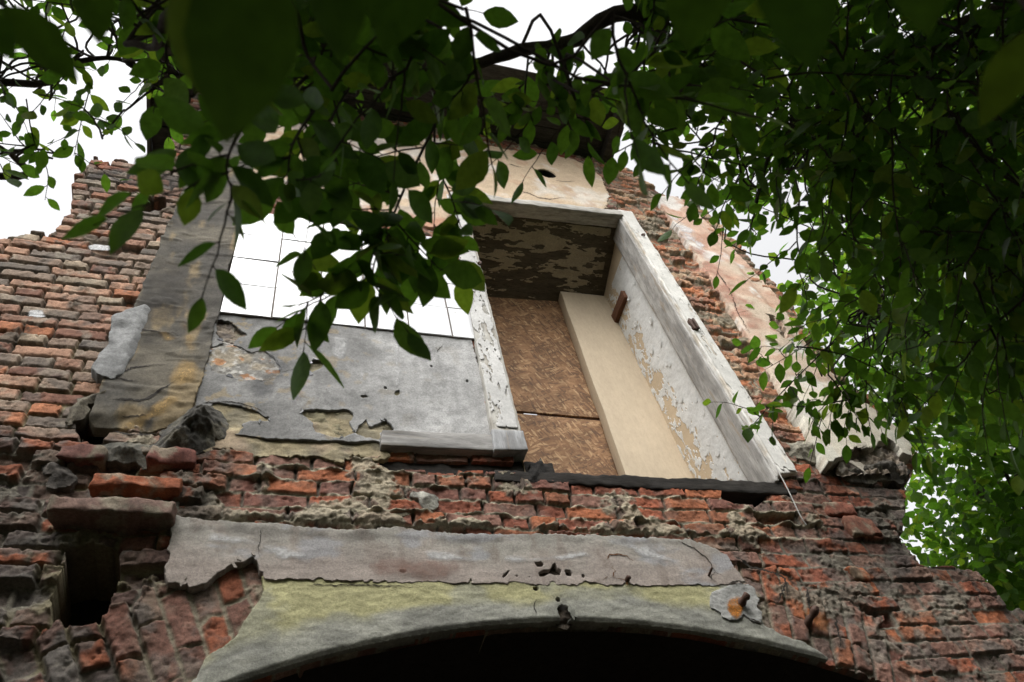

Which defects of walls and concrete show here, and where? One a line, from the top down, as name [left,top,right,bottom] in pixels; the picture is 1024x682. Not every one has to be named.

peeling [208,319,281,381]
spalling [309,358,323,376]
peeling [450,214,748,481]
peeling [620,210,796,471]
spalling [85,437,105,445]
crack [112,364,173,435]
spalling [300,409,355,438]
spalling [137,551,263,682]
crack [310,582,444,590]
corrosion [728,597,743,618]
crack [678,540,811,625]
corrosion [807,610,827,630]